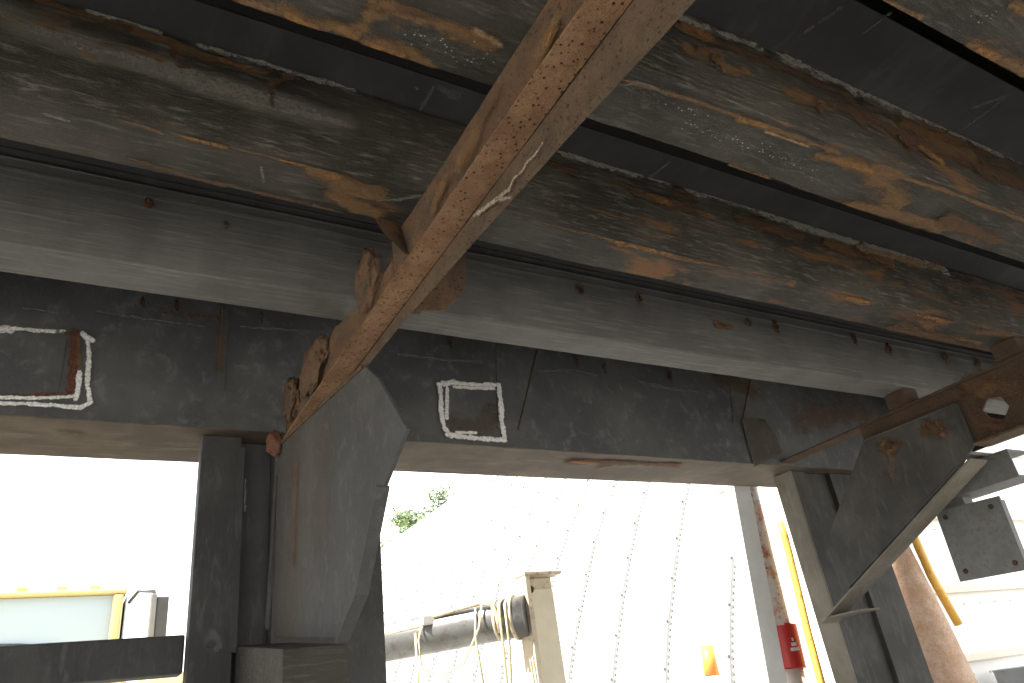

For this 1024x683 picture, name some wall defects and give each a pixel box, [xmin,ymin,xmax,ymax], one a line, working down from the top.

peeling [679,15,1021,164]
peeling [557,150,950,276]
rust [0,329,82,396]
rust [833,292,999,371]